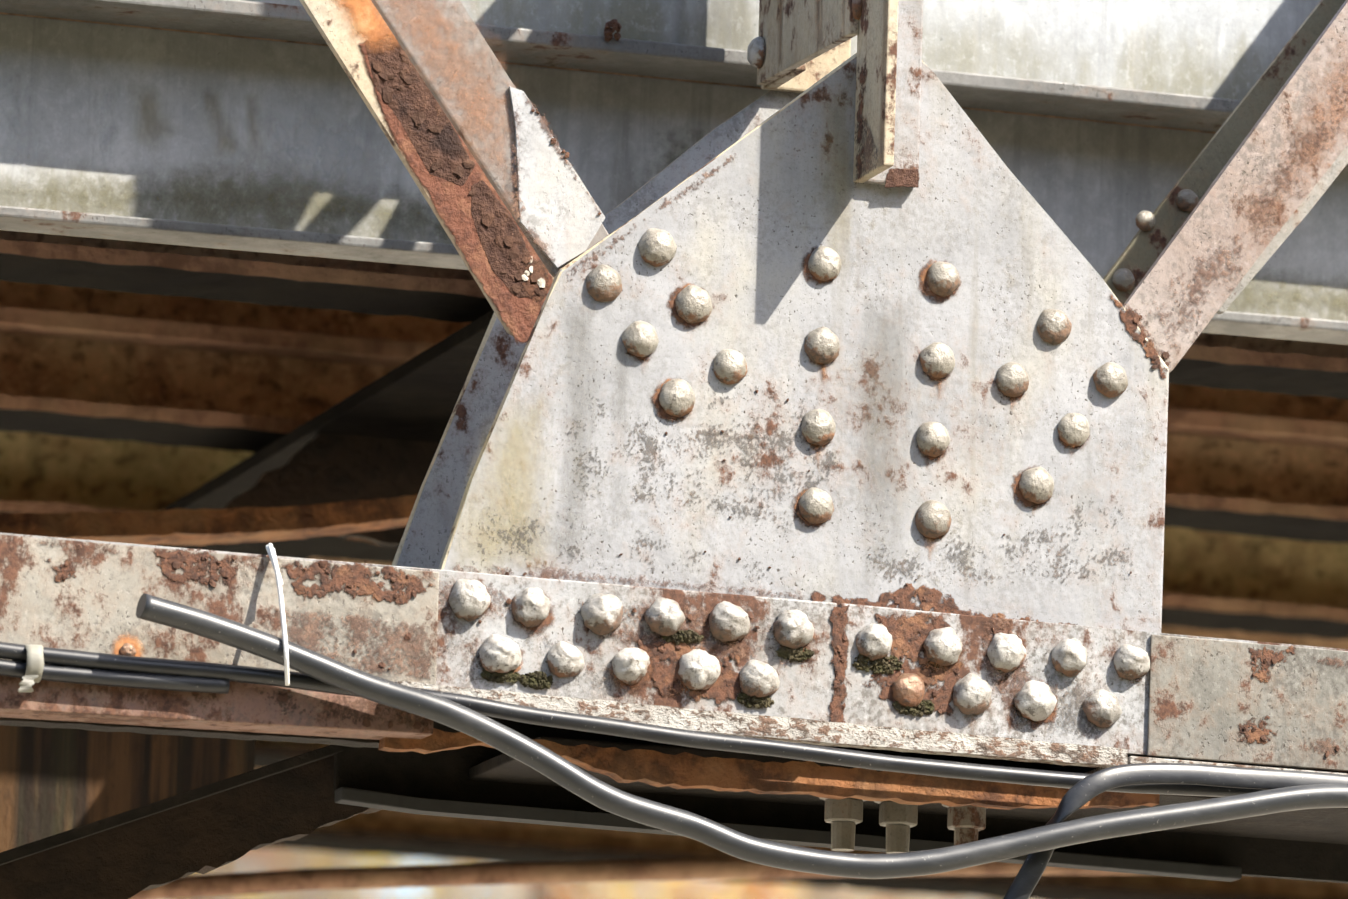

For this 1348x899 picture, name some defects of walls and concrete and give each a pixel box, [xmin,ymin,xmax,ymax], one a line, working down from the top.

corrosion [338,0,602,343]
corrosion [659,155,734,209]
corrosion [1110,73,1348,379]
corrosion [668,284,707,329]
corrosion [651,379,689,421]
corrosion [794,489,831,528]
corrosion [1011,468,1050,509]
corrosion [24,541,87,582]
corrosion [154,547,238,587]
corrosion [260,560,1058,733]
corrosion [1248,645,1296,683]
corrosion [1237,715,1278,745]